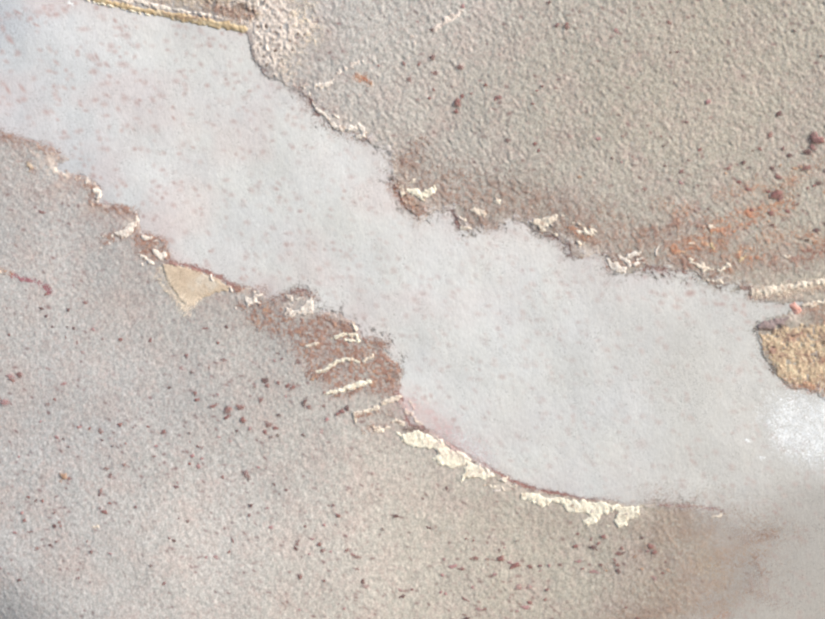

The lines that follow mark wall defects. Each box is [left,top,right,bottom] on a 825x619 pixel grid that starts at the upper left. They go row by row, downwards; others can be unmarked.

spalling [431,9,463,33]
spalling [86,0,370,147]
spalling [74,173,176,270]
spalling [385,175,437,226]
spalling [458,203,504,239]
spalling [526,214,597,248]
spalling [602,246,659,274]
spalling [230,279,318,320]
corrosion [237,296,407,435]
spalling [758,313,825,399]
corrosion [209,393,253,432]
spalling [361,400,642,528]